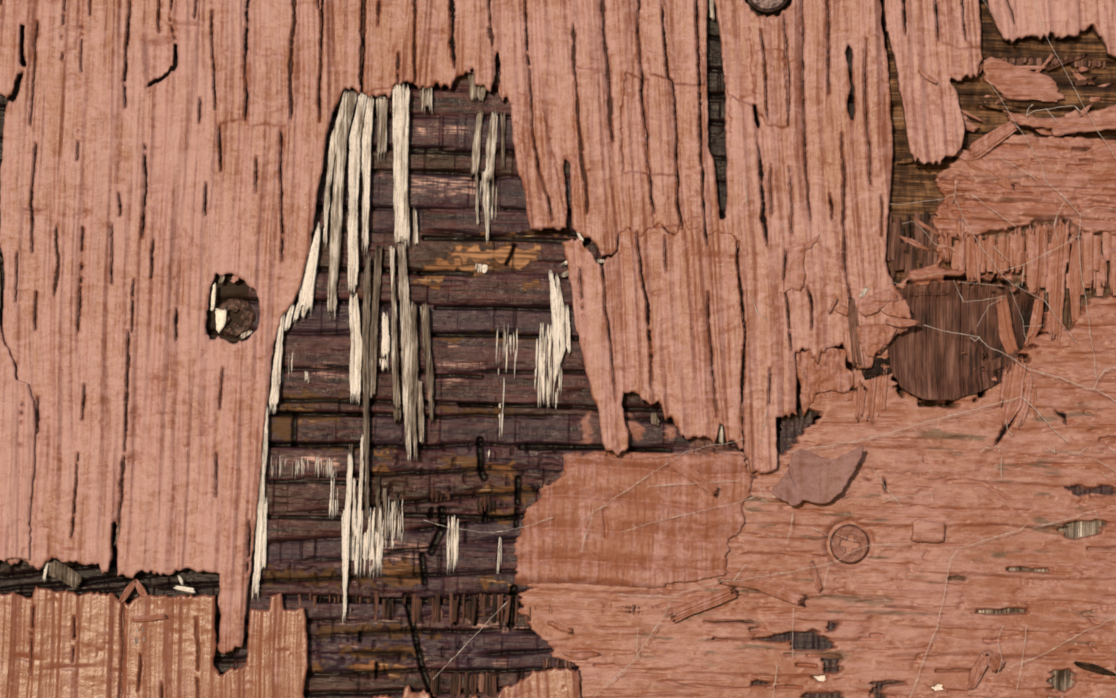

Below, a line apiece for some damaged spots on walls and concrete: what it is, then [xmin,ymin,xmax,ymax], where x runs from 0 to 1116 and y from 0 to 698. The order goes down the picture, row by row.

crack [15,1,90,331]
crack [123,2,131,108]
crack [158,0,249,216]
crack [255,0,323,254]
crack [525,2,552,216]
crack [572,28,589,210]
crack [601,0,613,141]
crack [637,0,708,386]
crack [758,0,883,350]
crack [111,146,154,522]
peeling [234,4,1116,698]
crack [707,246,771,424]